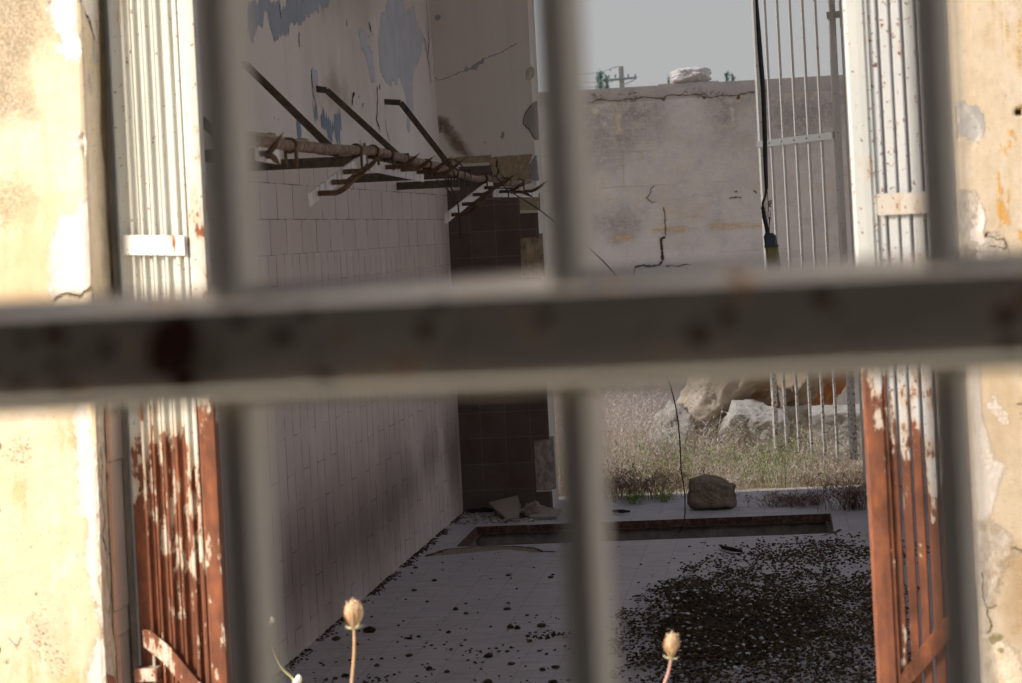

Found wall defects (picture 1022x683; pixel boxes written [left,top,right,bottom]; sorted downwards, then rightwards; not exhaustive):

flaking render [45,0,99,94]
peeling [248,0,329,48]
crack [424,0,517,81]
flaking render [523,101,539,140]
crack [588,91,755,103]
peeling [442,154,539,186]
flaking render [47,199,91,297]
crack [635,186,689,268]
rust [147,312,199,393]
flaking render [973,372,1010,522]
flaking render [72,411,122,683]
spalling [986,632,1022,683]